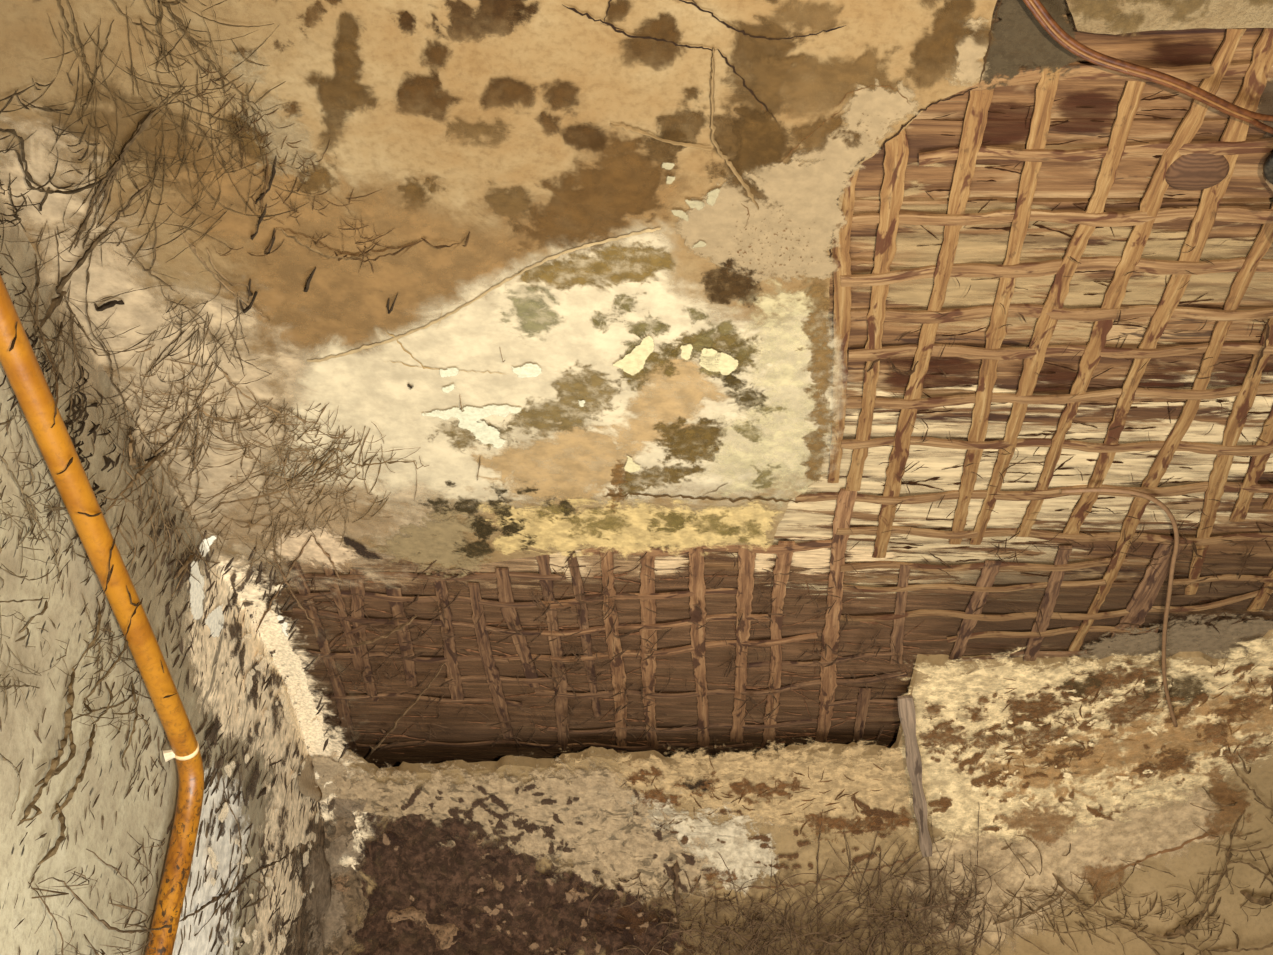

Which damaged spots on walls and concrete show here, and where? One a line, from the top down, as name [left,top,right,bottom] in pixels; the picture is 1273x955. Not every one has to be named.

crack [562,0,846,121]
peeling [662,163,675,184]
flaking render [671,17,989,283]
crack [779,85,908,164]
leakage [1180,238,1254,303]
peeling [422,405,522,449]
leakage [0,0,1204,768]
peeling [613,336,654,375]
peeling [680,344,738,375]
leakage [1161,362,1273,482]
leakage [980,675,1273,846]
leakage [277,807,288,856]